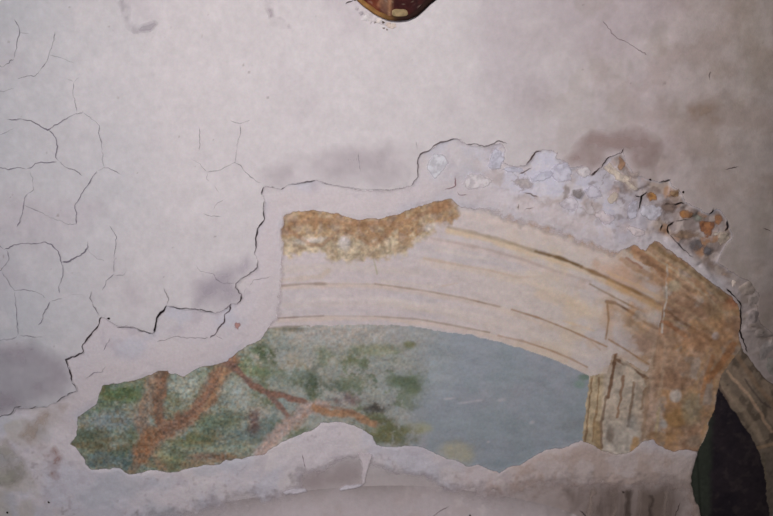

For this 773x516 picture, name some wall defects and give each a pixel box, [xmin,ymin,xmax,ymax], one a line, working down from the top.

spalling [354,0,397,30]
crack [8,108,117,223]
crack [33,242,87,323]
crack [57,276,112,402]
crack [119,163,265,341]
spalling [0,139,773,516]